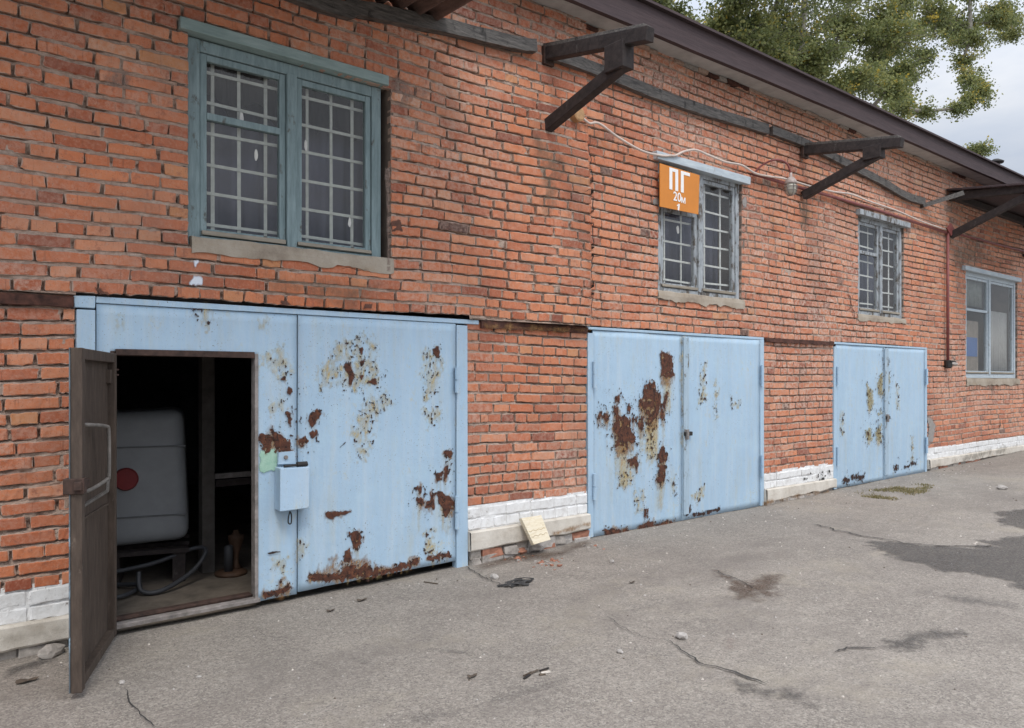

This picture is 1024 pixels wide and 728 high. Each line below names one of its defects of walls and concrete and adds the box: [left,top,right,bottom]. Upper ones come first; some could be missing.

rust [258,372,332,458]
spalling [319,336,392,458]
rust [593,351,675,490]
rust [861,350,894,446]
rust [263,577,292,599]
rust [305,522,452,584]
rust [408,448,455,523]
rust [602,504,720,535]